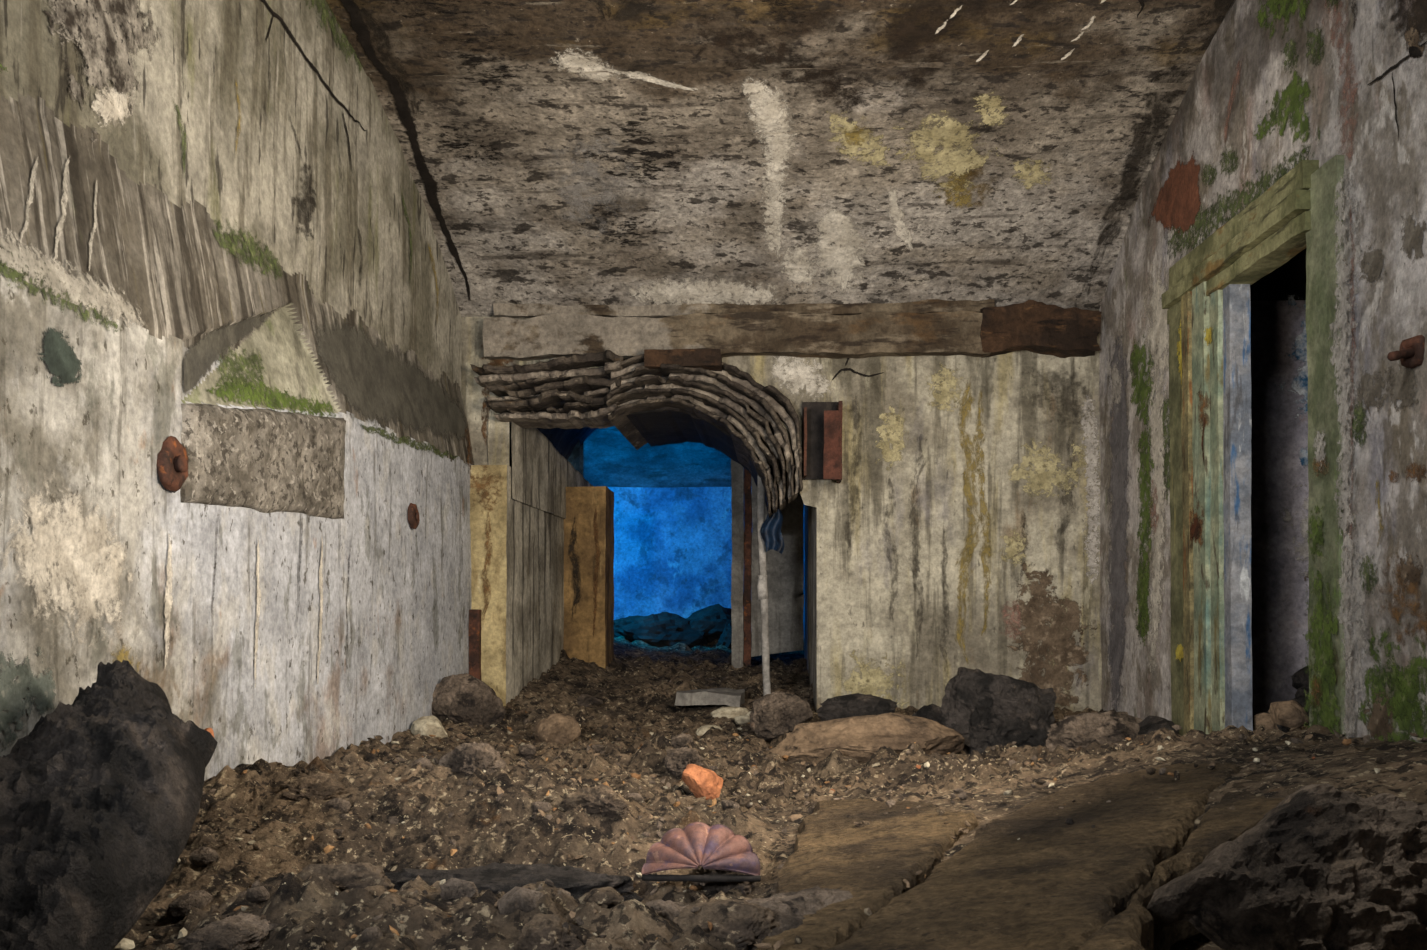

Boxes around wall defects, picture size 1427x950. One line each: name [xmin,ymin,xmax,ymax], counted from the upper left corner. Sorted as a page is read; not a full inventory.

crack [261,0,366,168]
crack [340,0,470,300]
damp [629,0,874,305]
damp [887,187,913,250]
damp [868,0,1052,87]
damp [875,406,909,471]
damp [926,364,991,664]
damp [1008,336,1132,712]
damp [838,650,909,706]